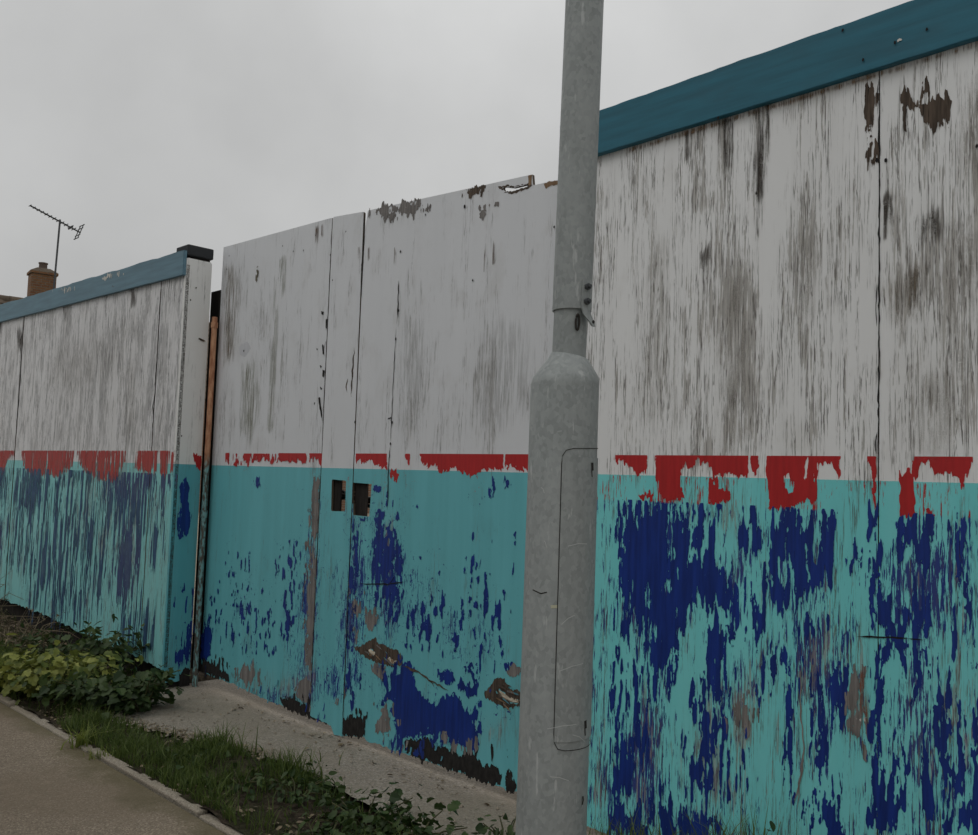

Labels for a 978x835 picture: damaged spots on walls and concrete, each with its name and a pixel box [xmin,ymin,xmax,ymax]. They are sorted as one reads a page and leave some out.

leakage [722,118,733,164]
leakage [753,105,769,197]
peeling [864,81,879,171]
peeling [900,76,952,134]
peeling [368,198,431,223]
peeling [462,185,499,221]
leakage [883,192,892,239]
leakage [921,208,940,242]
peeling [0,450,192,667]
peeling [173,453,528,761]
peeling [600,455,978,835]